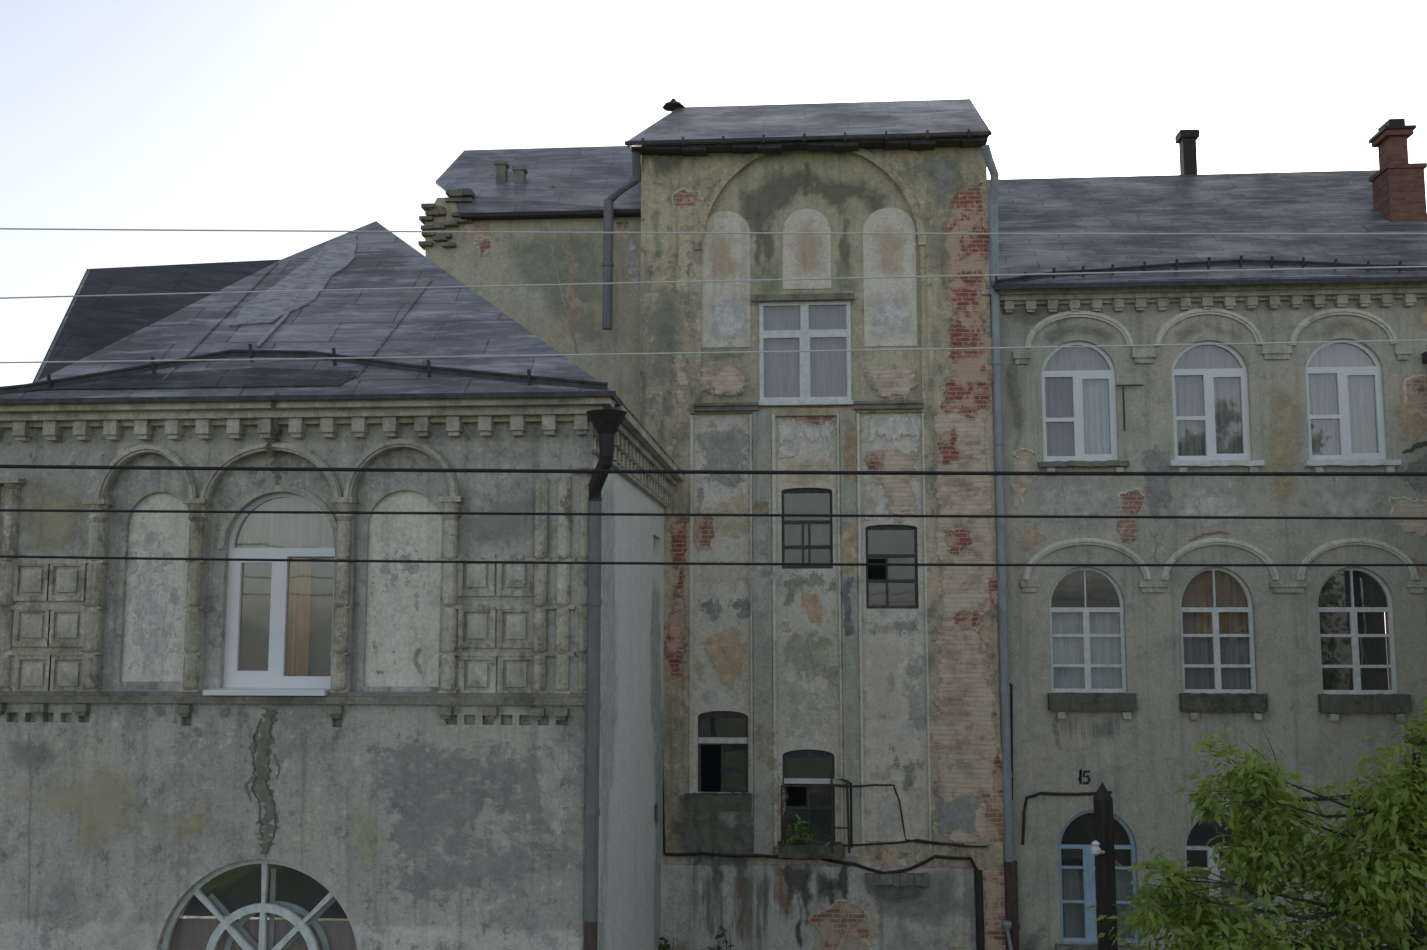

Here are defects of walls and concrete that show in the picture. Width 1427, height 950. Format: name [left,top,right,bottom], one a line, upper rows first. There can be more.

flaking render [1403,373,1427,418]
crack [1402,441,1427,454]
peeling [664,349,750,690]
flaking render [778,183,1147,844]
peeling [1315,476,1427,538]
crack [244,707,280,858]
water stain [651,589,956,950]
flaking render [807,899,869,950]
flaking render [982,870,1006,950]